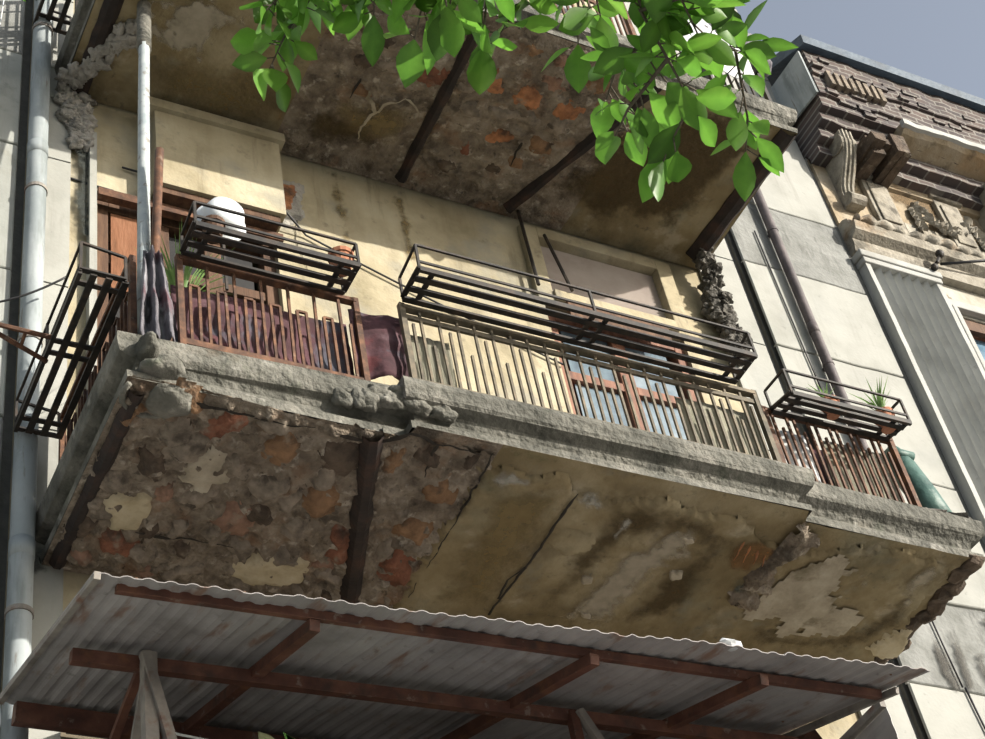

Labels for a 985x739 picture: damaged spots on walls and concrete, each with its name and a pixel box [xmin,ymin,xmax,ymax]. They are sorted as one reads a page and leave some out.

flaking render [151,0,234,62]
spalling [318,12,631,200]
flaking render [283,180,305,228]
spalling [57,375,496,609]
crack [488,494,578,615]
damp [576,512,717,571]
damp [636,558,708,616]
flaking render [743,554,864,638]
spalling [865,554,985,664]